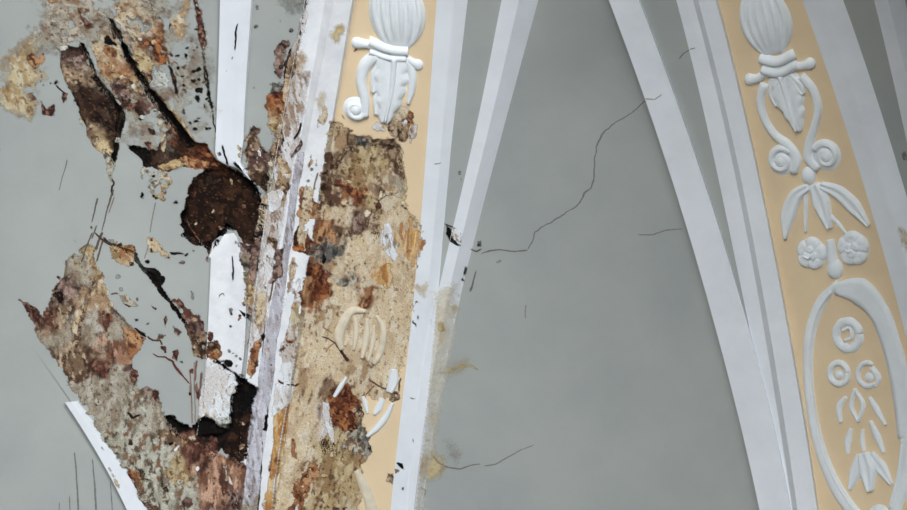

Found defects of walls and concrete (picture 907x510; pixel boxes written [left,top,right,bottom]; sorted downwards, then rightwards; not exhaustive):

crack [104,0,216,148]
spalling [18,0,426,510]
crack [482,95,661,263]